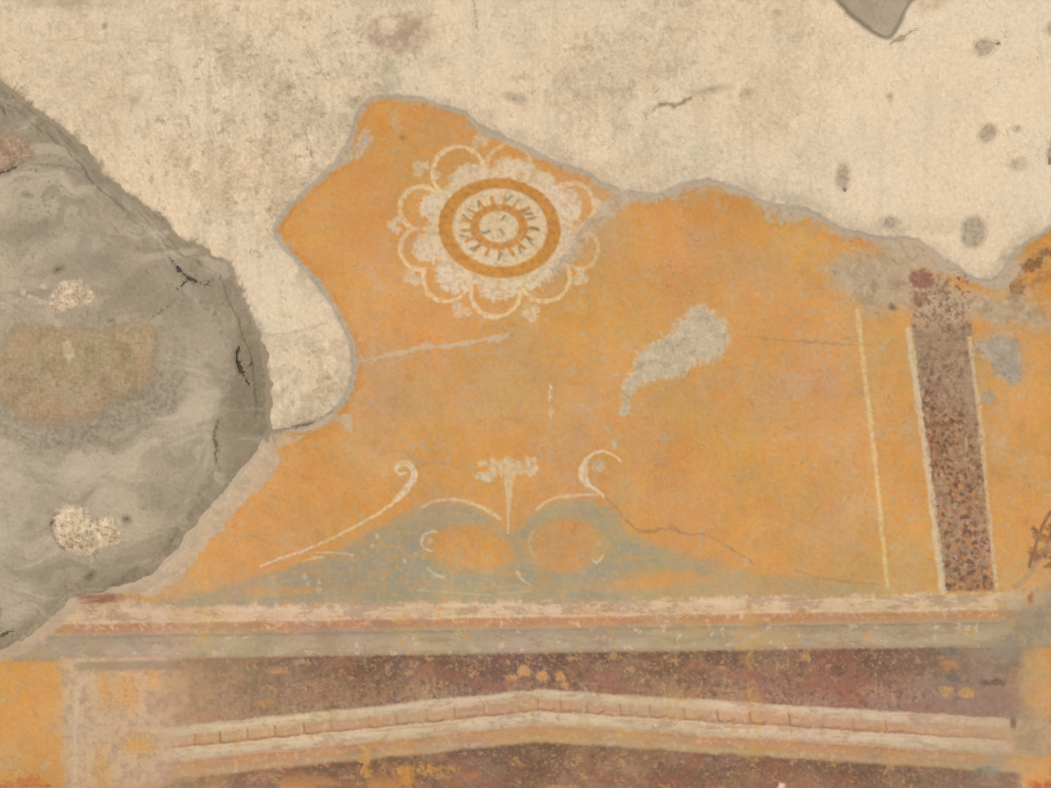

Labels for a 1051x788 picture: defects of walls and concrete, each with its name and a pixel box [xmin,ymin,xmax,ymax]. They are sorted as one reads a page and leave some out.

spalling [970,34,1002,60]
spalling [975,121,1024,147]
spalling [832,158,855,196]
peeling [546,181,644,278]
spalling [958,212,990,251]
crack [148,254,215,322]
flaking render [0,277,166,433]
crack [233,320,329,388]
peeling [603,301,735,452]
peeling [966,330,1031,407]
spalling [0,414,355,666]
crack [602,496,757,566]